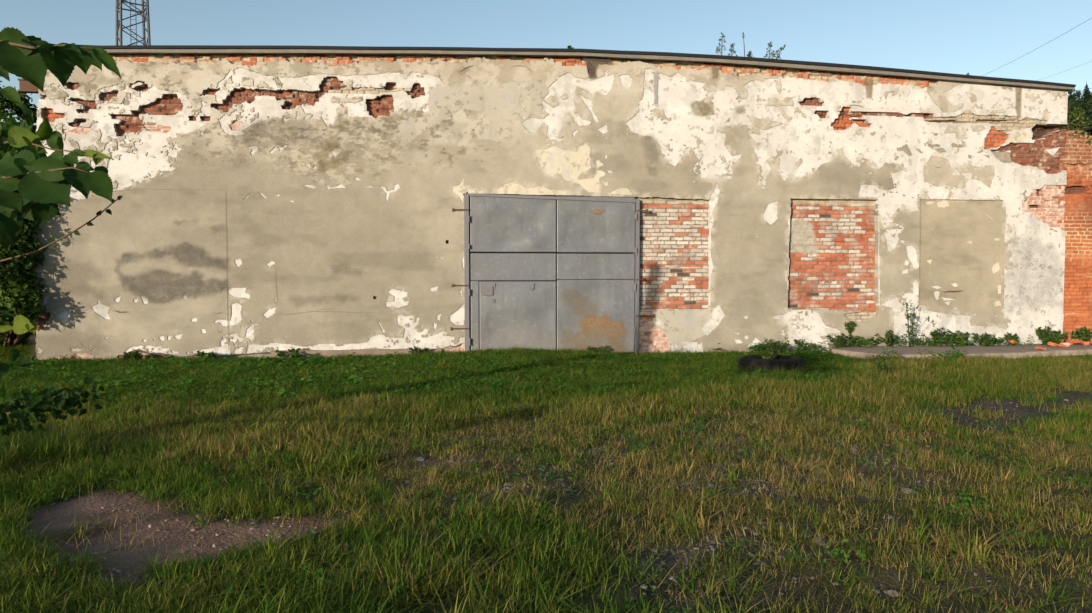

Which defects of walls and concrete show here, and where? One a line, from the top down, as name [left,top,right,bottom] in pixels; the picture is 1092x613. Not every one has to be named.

water stain [123,246,226,302]
peeling [36,54,1092,361]